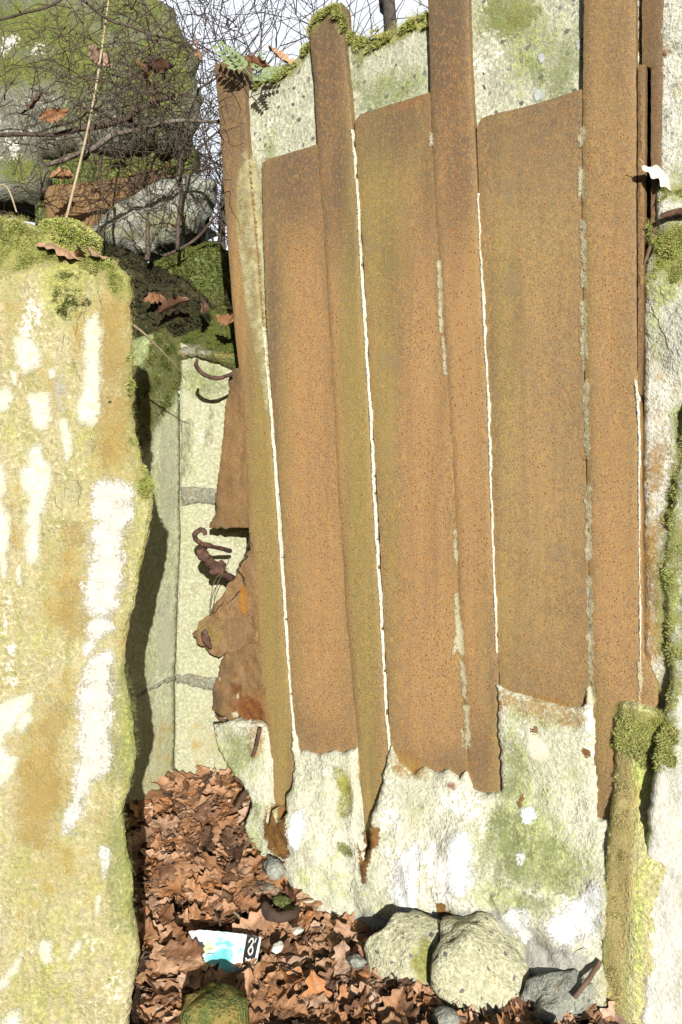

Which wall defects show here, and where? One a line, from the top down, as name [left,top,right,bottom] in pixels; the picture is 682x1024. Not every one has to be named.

water stain [520,806,538,825]
rust [357,825,380,884]